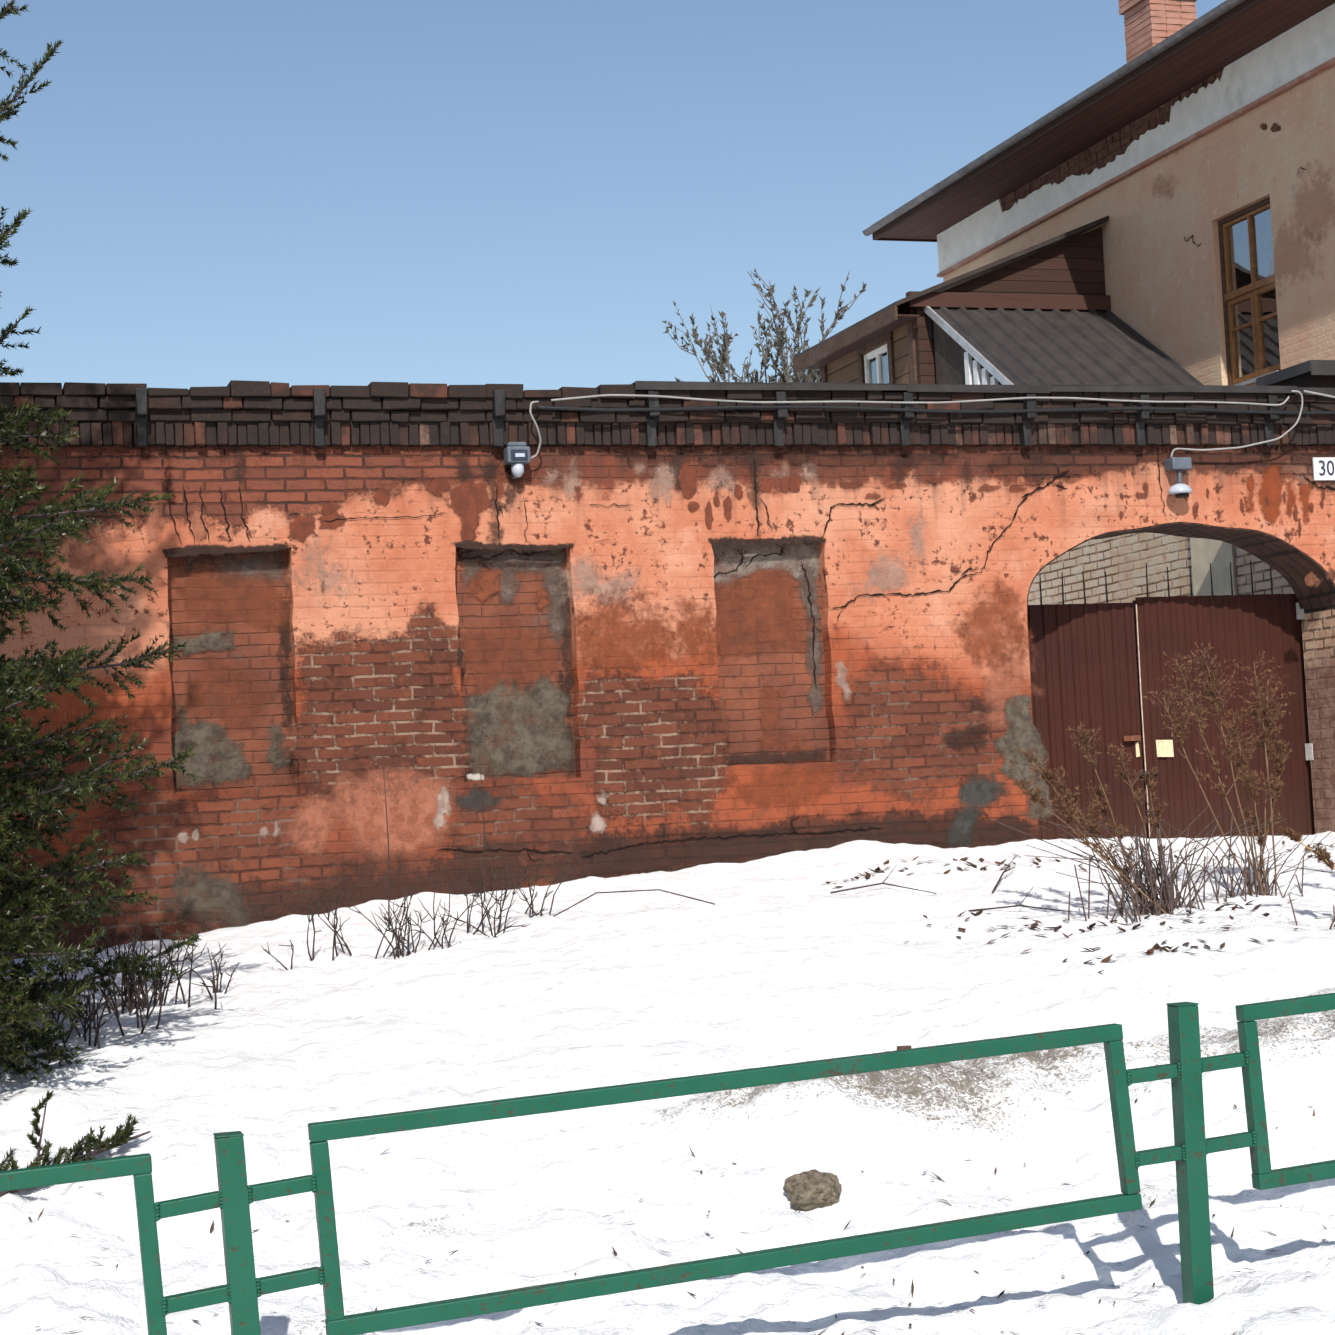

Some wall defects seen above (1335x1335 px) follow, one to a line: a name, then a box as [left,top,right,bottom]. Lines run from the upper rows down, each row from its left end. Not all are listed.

flaking render [1001,70,1223,211]
flaking render [0,443,574,577]
peeling [535,576,569,640]
crack [714,460,1074,690]
flaking render [86,602,1037,941]